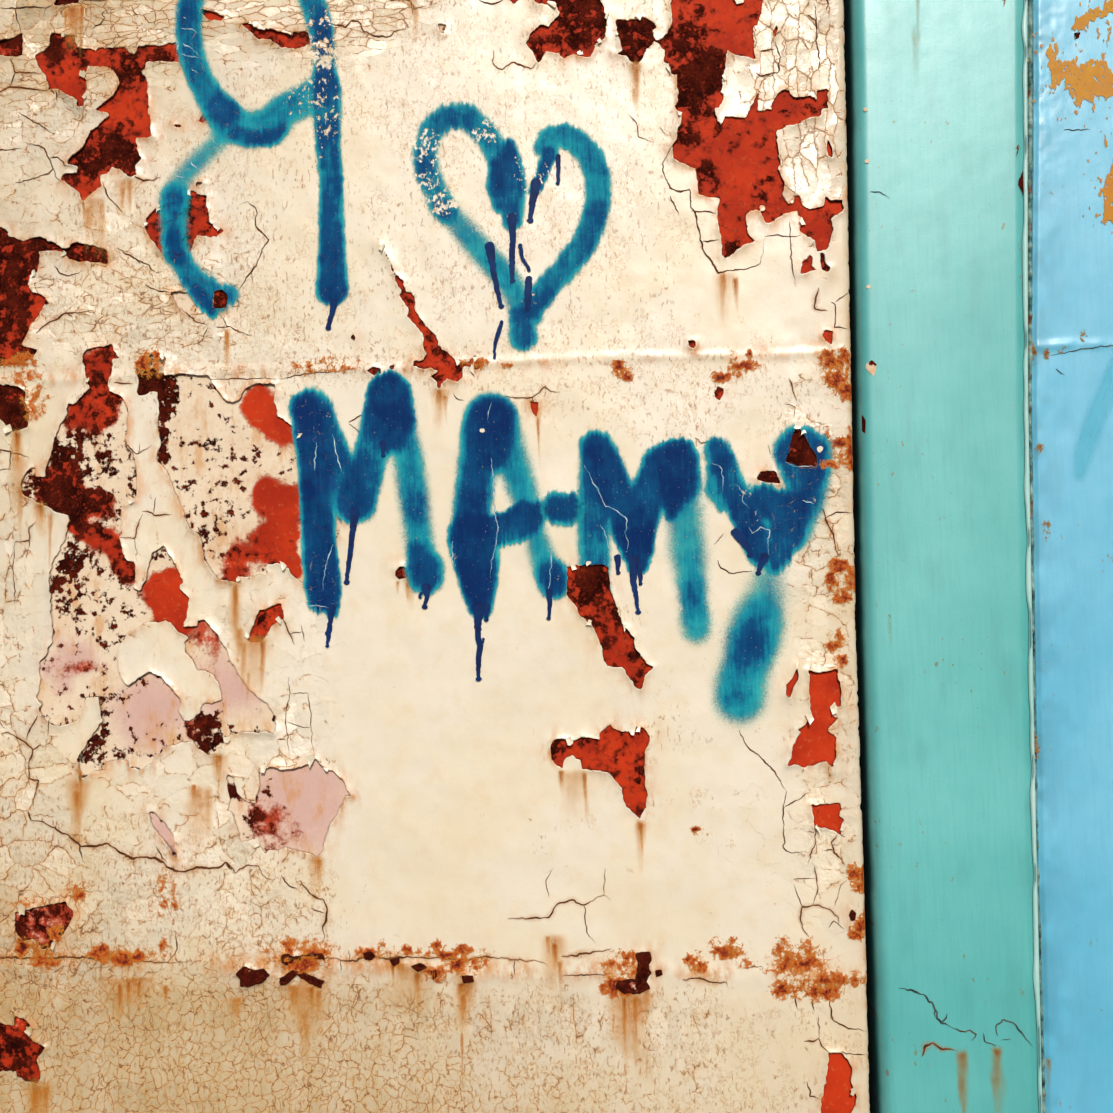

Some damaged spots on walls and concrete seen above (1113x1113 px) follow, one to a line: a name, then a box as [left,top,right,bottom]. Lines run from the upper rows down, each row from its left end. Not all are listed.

crack [0,59,67,183]
peeling [36,32,180,201]
peeling [526,0,844,274]
crack [630,116,848,329]
peeling [21,344,276,778]
peeling [136,351,341,584]
crack [0,715,613,976]
crack [739,730,847,937]
rust [236,936,340,1000]
rust [355,940,489,1011]
rust [598,948,663,1030]
rust [682,935,867,1004]